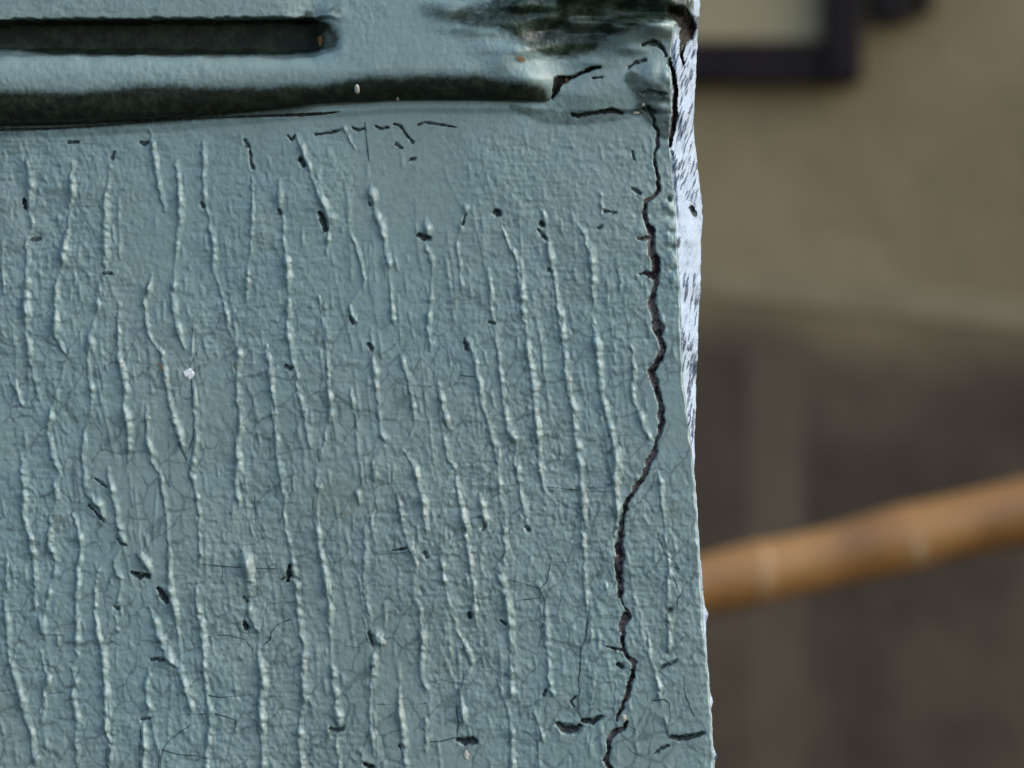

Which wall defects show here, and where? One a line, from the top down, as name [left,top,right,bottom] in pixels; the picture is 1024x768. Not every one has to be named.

peeling [2,154,218,768]
crack [178,379,194,460]
crack [138,694,257,768]
crack [202,564,276,582]
crack [208,619,291,653]
peeling [264,177,327,498]
peeling [281,512,313,768]
peeling [287,123,416,268]
crack [423,658,464,747]
peeling [435,209,549,768]
crack [546,66,695,768]
peeling [628,0,703,467]